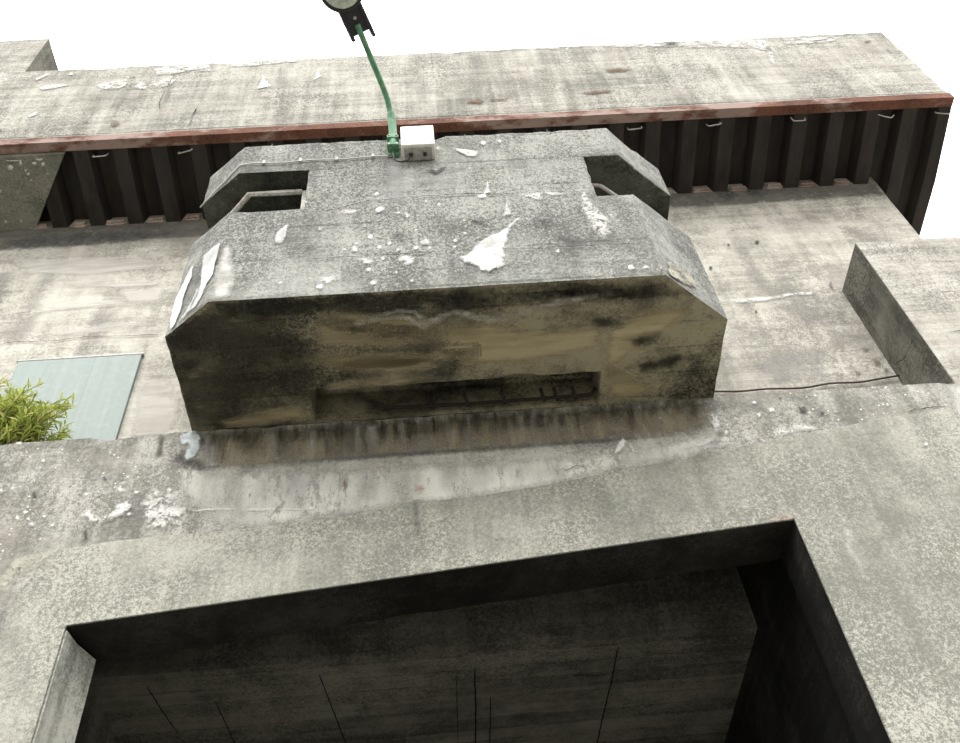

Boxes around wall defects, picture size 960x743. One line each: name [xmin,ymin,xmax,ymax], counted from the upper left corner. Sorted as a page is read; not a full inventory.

spalling [462,206,512,271]
leakage [138,248,349,416]
leakage [357,283,656,327]
leakage [641,356,681,371]
leakage [143,401,729,527]
leakage [85,483,131,522]
crack [574,646,619,743]